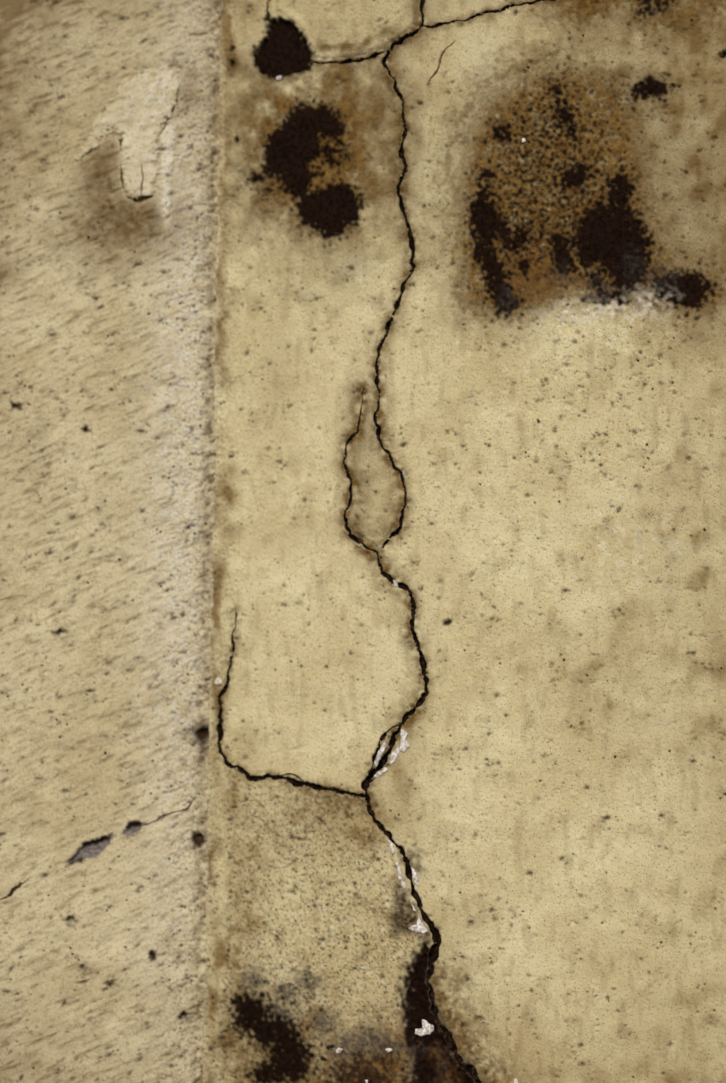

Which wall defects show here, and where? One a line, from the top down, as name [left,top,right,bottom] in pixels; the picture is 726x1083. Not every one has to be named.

leakage [238,65,390,243]
leakage [452,60,726,321]
crack [216,0,556,1083]
spalling [68,836,110,864]
spalling [123,821,142,835]
leakage [228,973,332,1083]